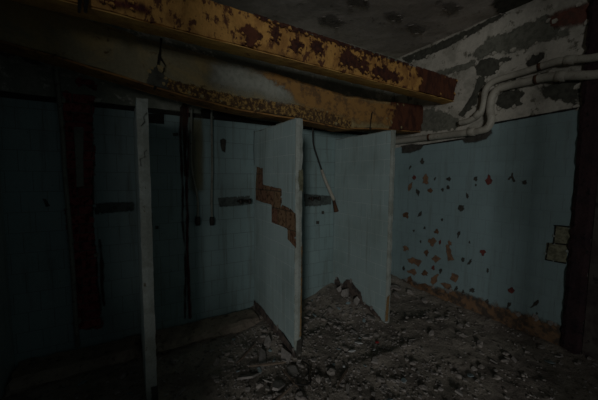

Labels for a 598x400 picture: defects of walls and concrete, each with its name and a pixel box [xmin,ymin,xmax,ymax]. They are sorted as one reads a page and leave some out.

peeling [235,0,591,132]
peeling [218,167,296,248]
flaking render [402,229,562,346]
peeling [544,225,571,264]